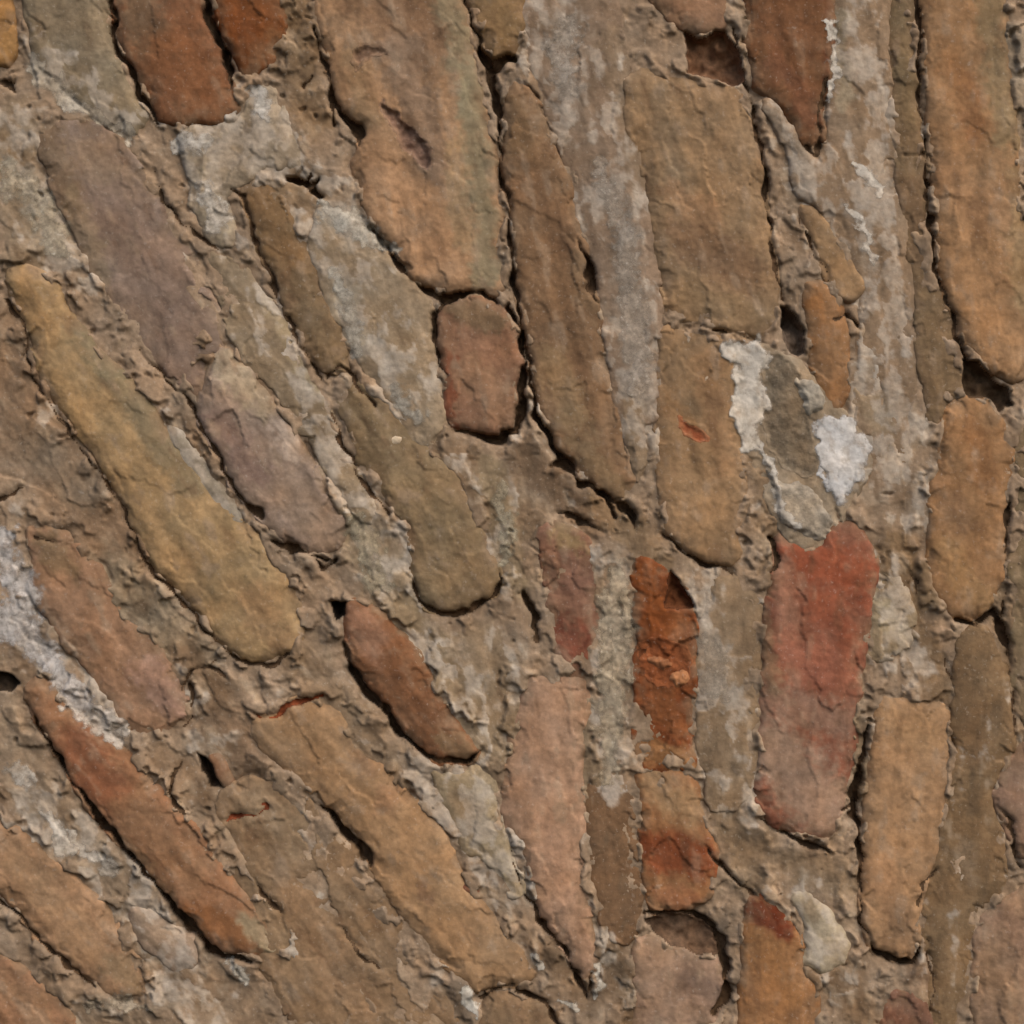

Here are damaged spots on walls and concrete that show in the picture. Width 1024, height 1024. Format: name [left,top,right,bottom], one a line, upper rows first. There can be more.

damp [719,333,802,529]
damp [812,415,873,506]